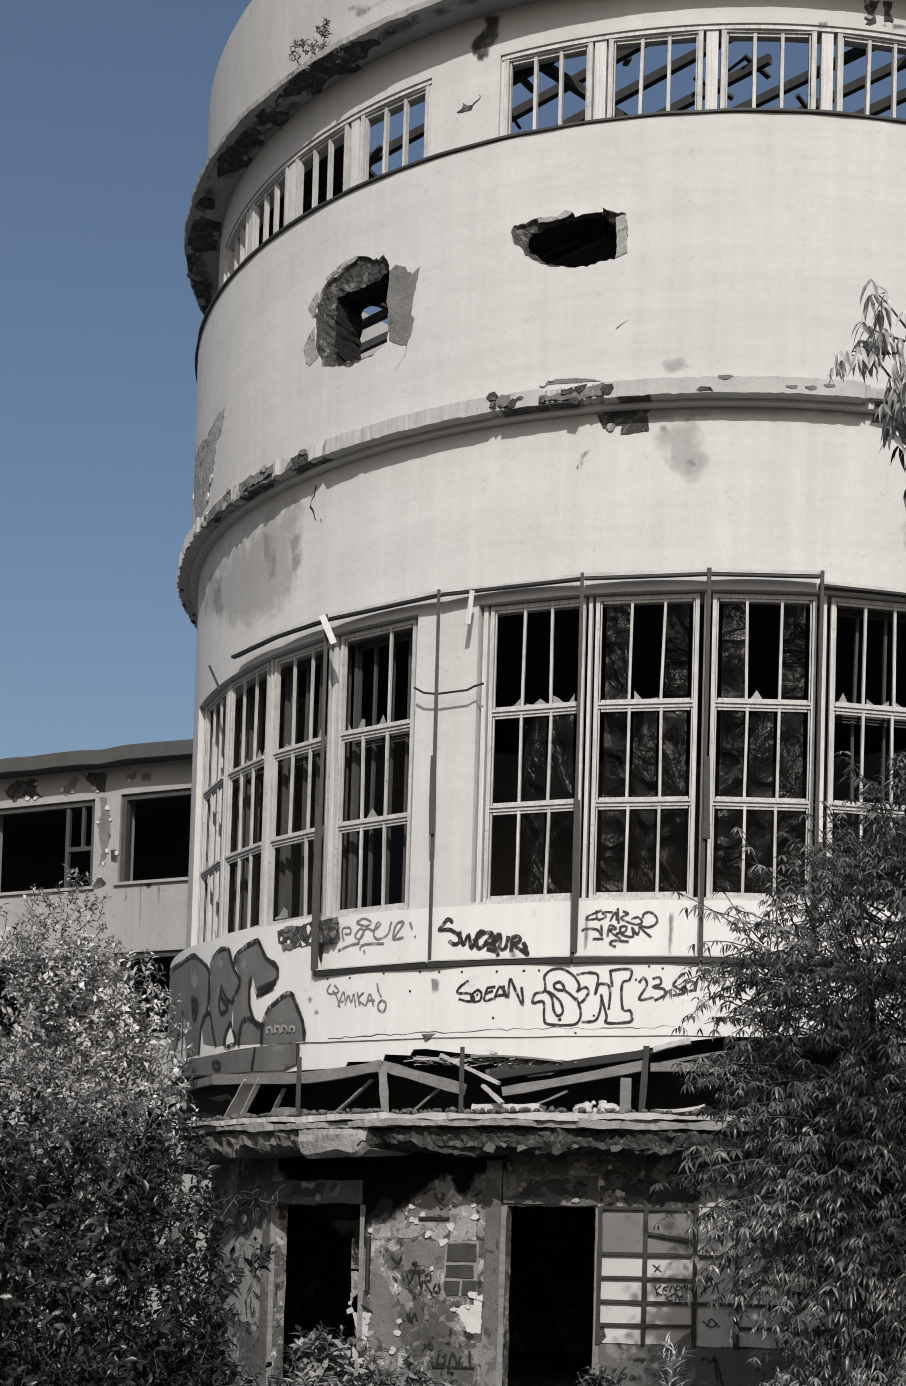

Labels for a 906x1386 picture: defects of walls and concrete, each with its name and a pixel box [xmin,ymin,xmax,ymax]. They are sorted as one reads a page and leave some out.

peeling [538,208,628,258]
peeling [303,256,358,366]
peeling [386,265,420,345]
peeling [486,376,652,435]
peeling [185,408,269,551]
peeling [4,779,43,803]
peeling [59,772,119,888]
flaking render [368,1194,483,1334]
peeling [346,1271,404,1354]